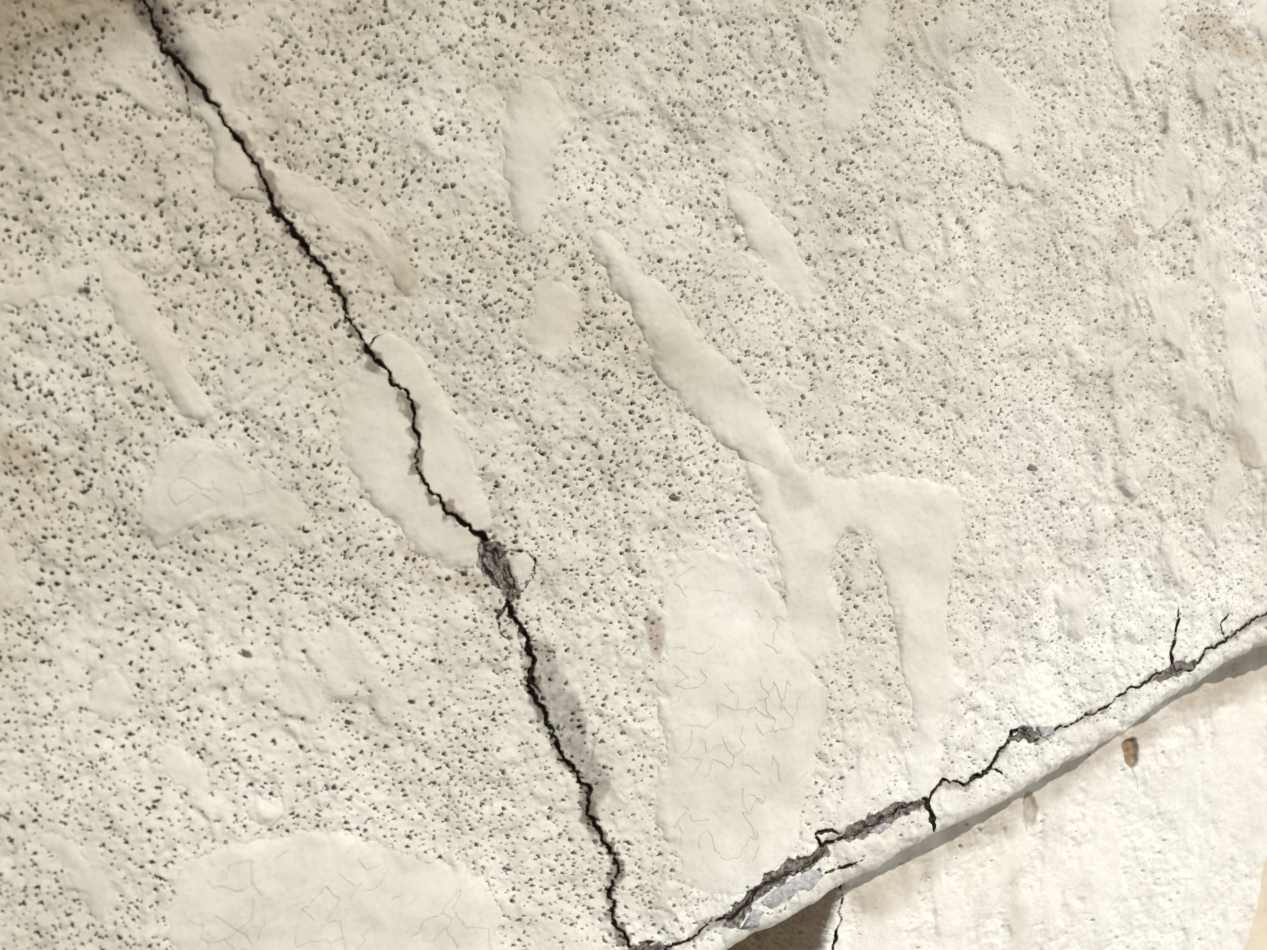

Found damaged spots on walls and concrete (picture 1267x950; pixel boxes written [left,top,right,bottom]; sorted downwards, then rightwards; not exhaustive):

crack [142,0,1047,950]
crack [1054,605,1267,731]